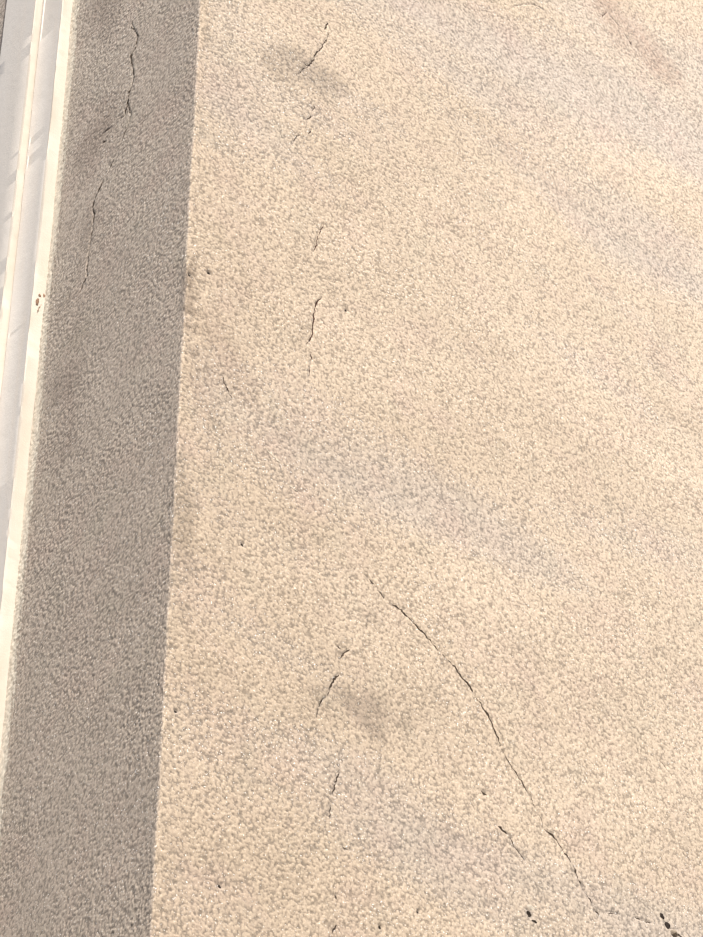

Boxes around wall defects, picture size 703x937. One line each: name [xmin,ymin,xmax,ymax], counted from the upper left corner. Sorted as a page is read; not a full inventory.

crack [300,23,329,73]
crack [300,281,331,375]
crack [316,647,350,715]
crack [368,578,615,915]